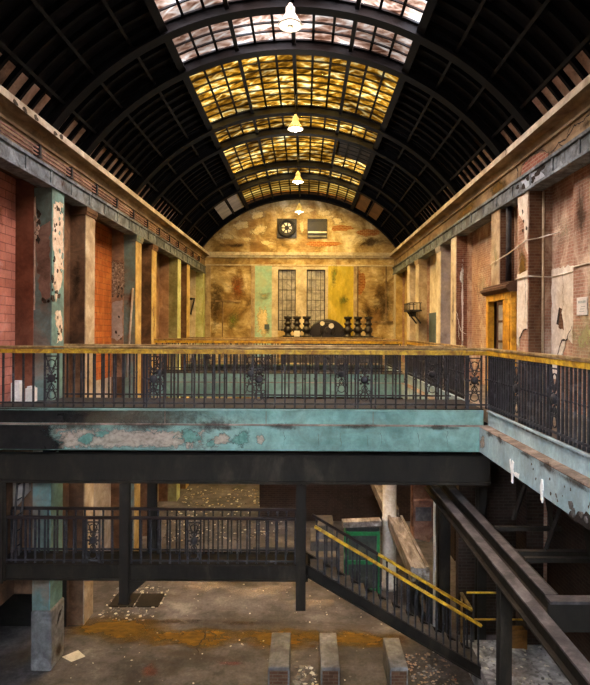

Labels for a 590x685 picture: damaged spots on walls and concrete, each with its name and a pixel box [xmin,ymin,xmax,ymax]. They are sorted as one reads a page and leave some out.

flaking render [516,149,549,254]
peeling [34,196,64,343]
water stain [211,287,222,321]
flaking render [551,265,573,379]
peeling [55,428,205,449]
spalling [550,485,590,530]